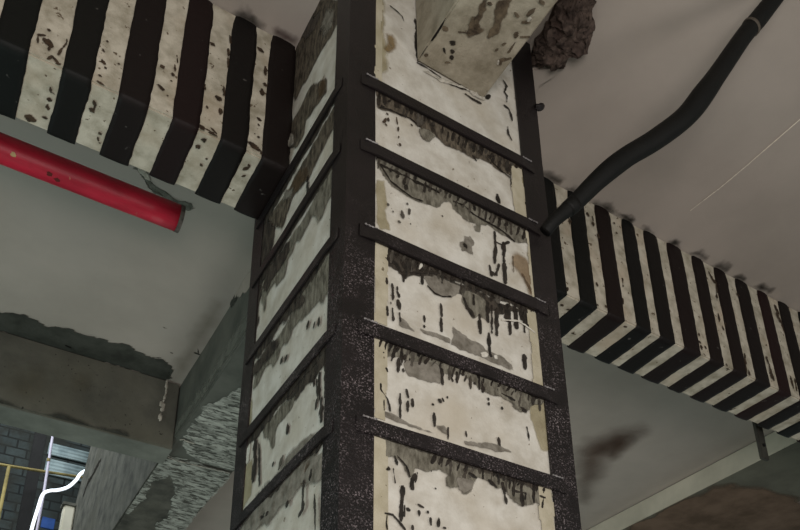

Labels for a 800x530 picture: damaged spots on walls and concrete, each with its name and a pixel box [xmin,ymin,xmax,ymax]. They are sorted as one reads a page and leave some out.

spalling [443,0,597,94]
peeling [376,91,523,178]
peeling [376,157,527,243]
flaking render [0,313,173,380]
peeling [252,250,329,389]
peeling [385,247,535,336]
peeling [379,340,544,413]
peeling [379,437,553,508]